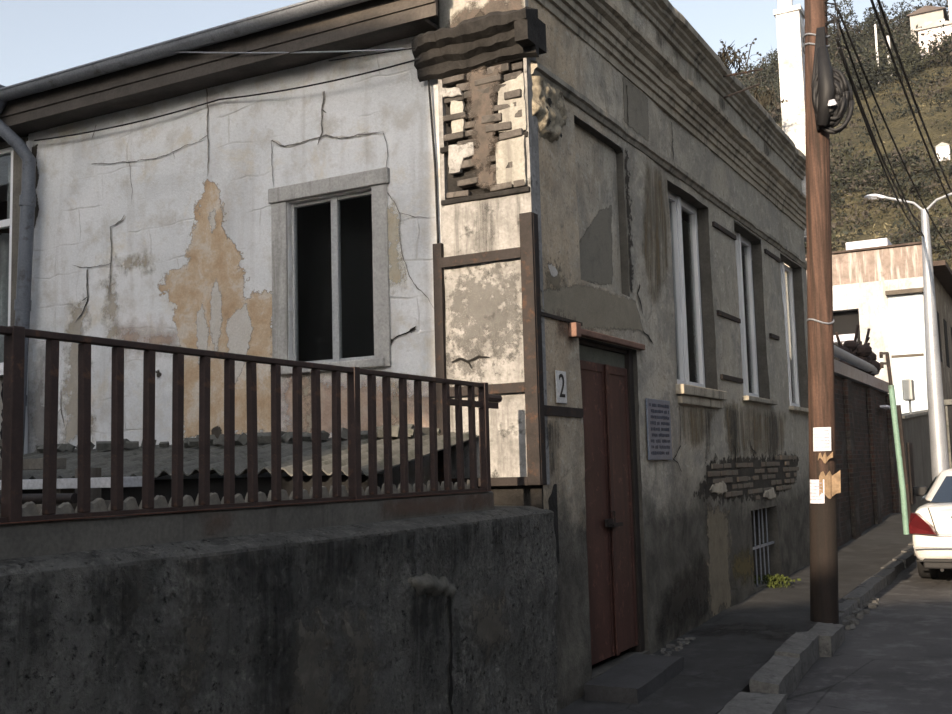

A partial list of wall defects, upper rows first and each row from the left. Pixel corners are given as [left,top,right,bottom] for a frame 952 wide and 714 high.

crack [73,88,210,322]
peeling [158,179,272,439]
crack [271,91,388,186]
crack [390,326,416,342]
crack [387,193,433,307]
spalling [440,62,531,206]
damp [659,557,793,641]
flaking render [694,451,800,617]